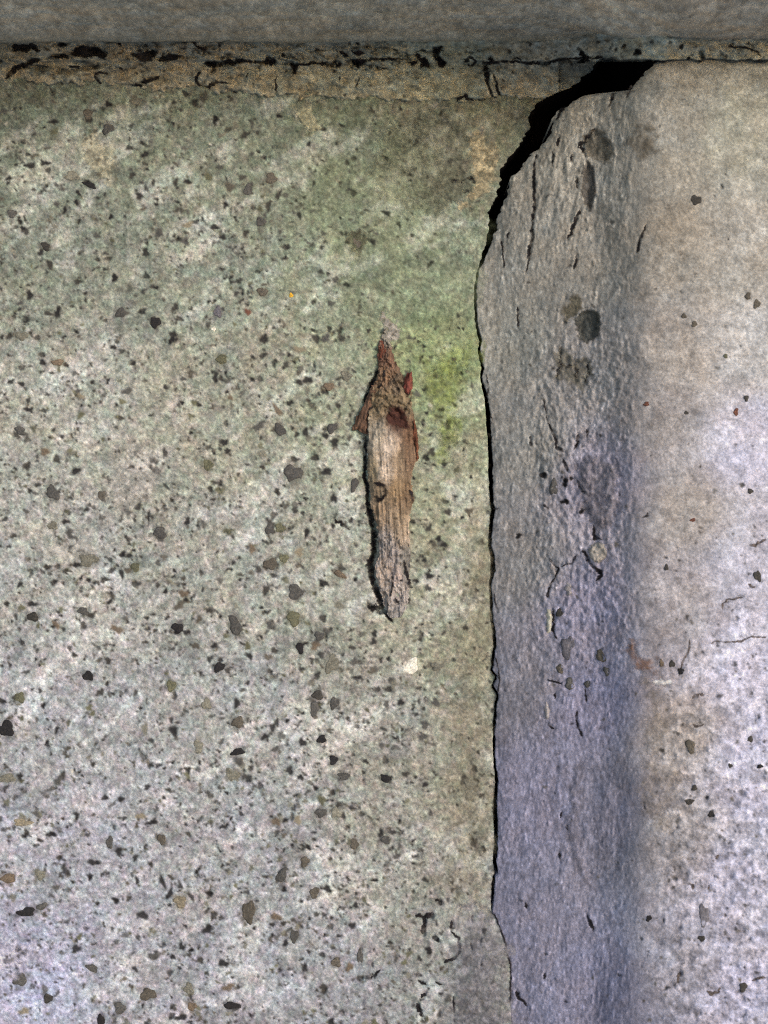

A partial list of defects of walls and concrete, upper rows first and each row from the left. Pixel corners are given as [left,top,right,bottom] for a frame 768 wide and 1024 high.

crack [132,42,666,1023]